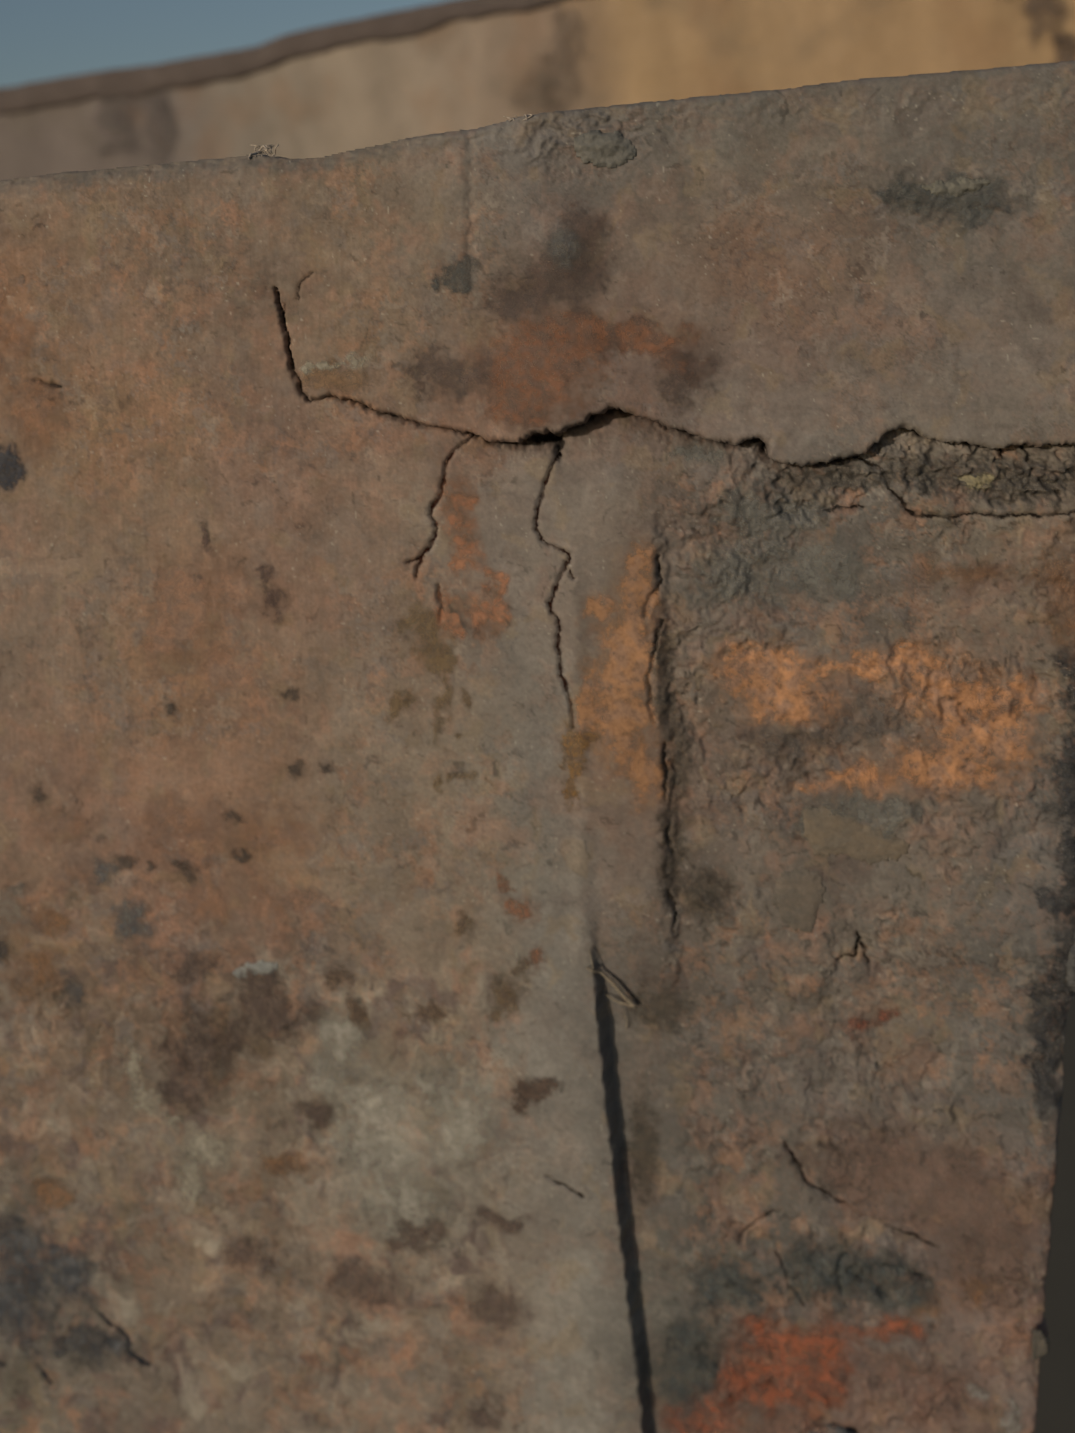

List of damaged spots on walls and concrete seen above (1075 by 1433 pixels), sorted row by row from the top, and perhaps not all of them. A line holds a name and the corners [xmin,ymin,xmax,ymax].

crack [278,272,313,398]
crack [407,432,574,727]
rust [559,545,667,803]
rust [719,642,1034,800]
crack [785,1143,935,1297]